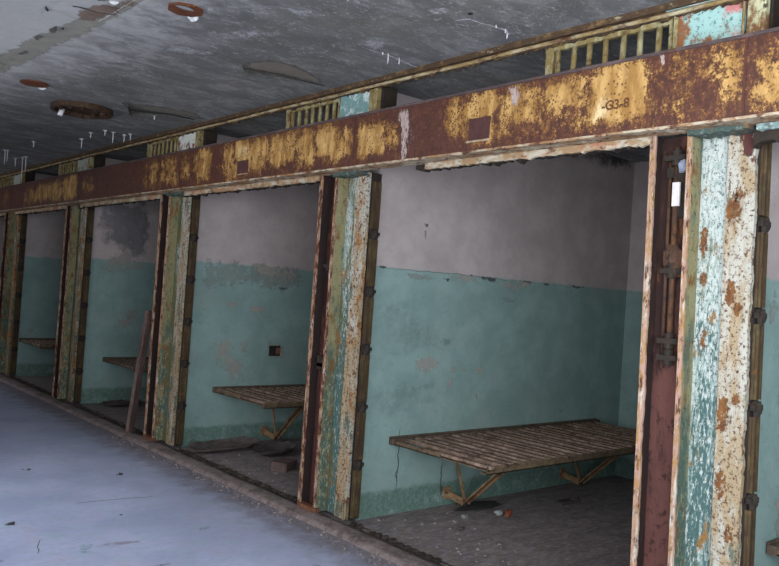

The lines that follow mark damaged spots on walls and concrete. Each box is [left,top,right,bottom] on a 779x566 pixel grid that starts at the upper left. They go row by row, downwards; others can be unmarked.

flaking render [0,0,144,73]
corrosion [726,186,748,228]
corrosion [699,226,708,258]
peeling [379,266,531,302]
corrosion [724,279,743,317]
corrosion [716,393,740,433]
corrosion [713,470,729,501]